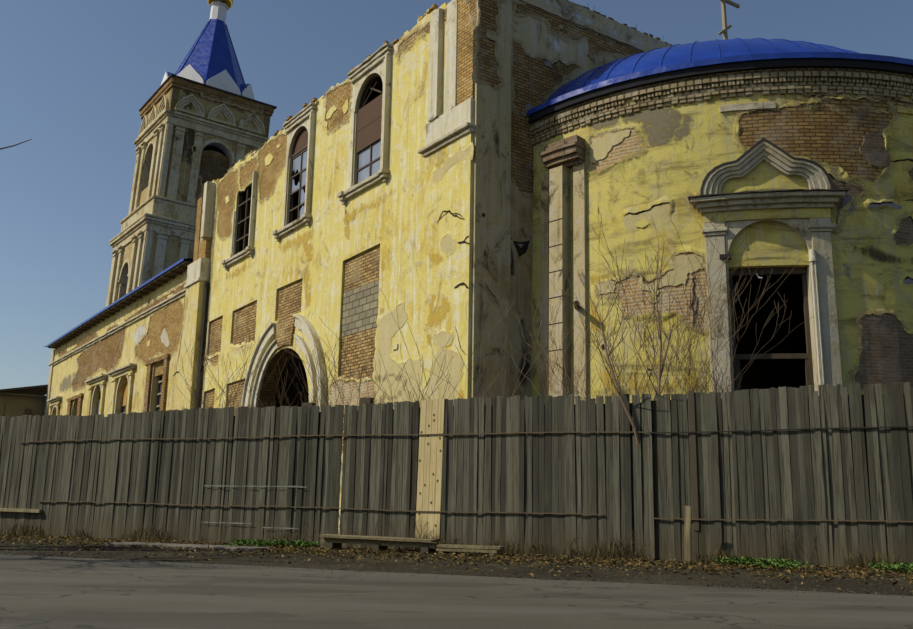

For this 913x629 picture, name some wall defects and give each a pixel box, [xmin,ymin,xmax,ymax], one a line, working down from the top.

flaking render [395,20,430,64]
flaking render [443,0,646,198]
flaking render [432,142,474,184]
flaking render [732,93,913,251]
flaking render [58,280,186,393]
flaking render [591,245,709,337]
flaking render [847,308,913,395]